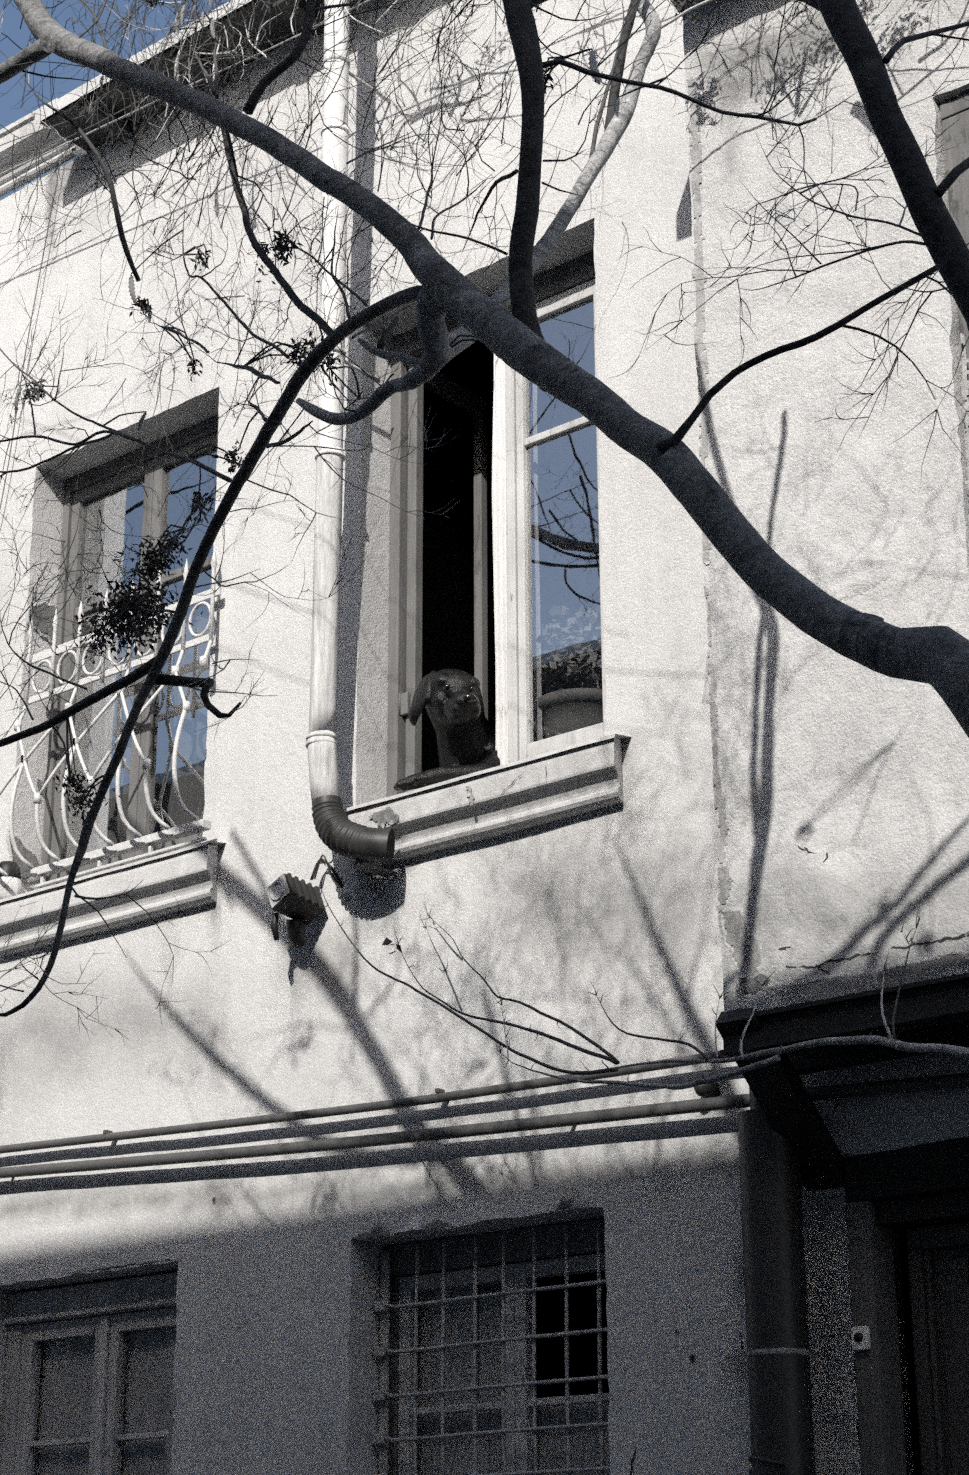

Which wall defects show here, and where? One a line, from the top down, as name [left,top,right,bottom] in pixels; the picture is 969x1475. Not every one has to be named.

flaking render [686,75,710,469]
flaking render [702,531,711,564]
flaking render [703,585,969,1012]
crack [779,931,969,973]